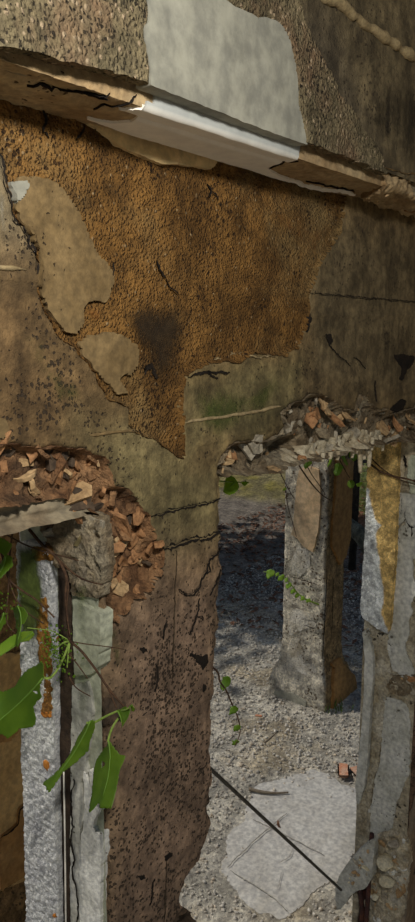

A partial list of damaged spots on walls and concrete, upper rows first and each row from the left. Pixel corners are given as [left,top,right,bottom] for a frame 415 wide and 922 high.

peeling [0,0,149,86]
crack [27,82,137,139]
peeling [227,0,388,175]
water stain [132,311,183,368]
spalling [0,100,347,459]
crack [324,336,377,402]
crack [151,498,221,517]
rust [36,597,59,718]
spalling [0,418,165,922]
crack [154,530,223,691]
spalling [217,394,415,922]